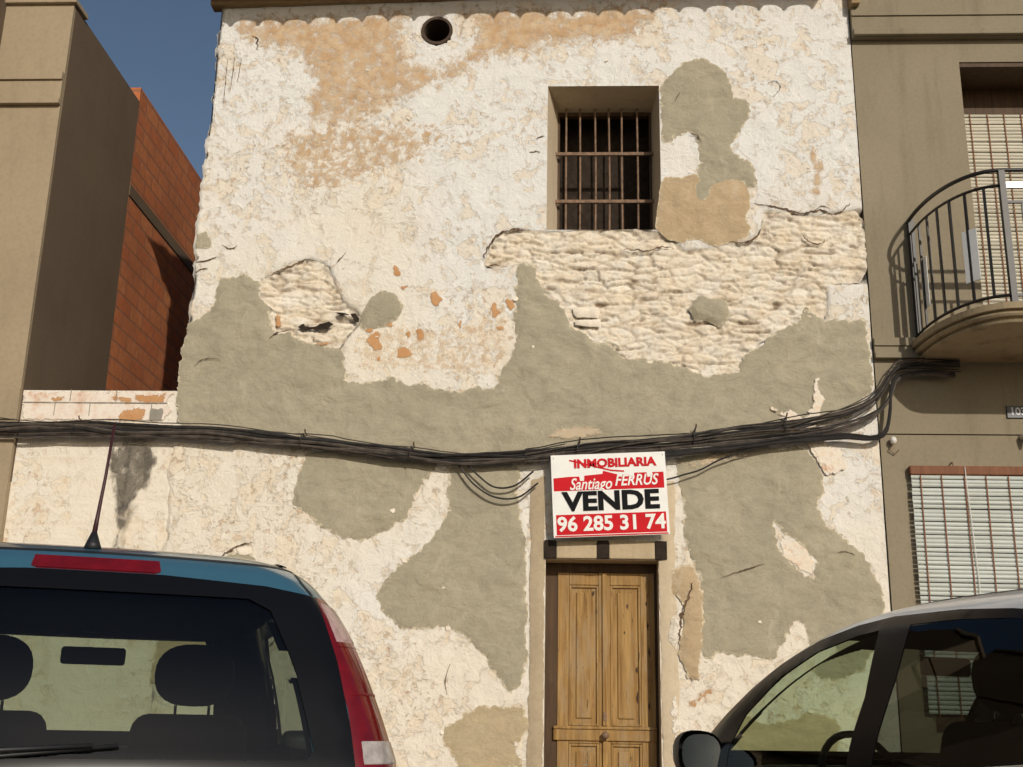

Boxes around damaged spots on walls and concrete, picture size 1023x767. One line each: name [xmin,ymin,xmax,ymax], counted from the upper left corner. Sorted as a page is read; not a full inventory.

spalling [260,261,518,374]
spalling [485,174,867,378]
damp [109,444,156,548]
peeling [222,542,256,561]
peeling [668,563,709,680]
peeling [440,703,529,767]